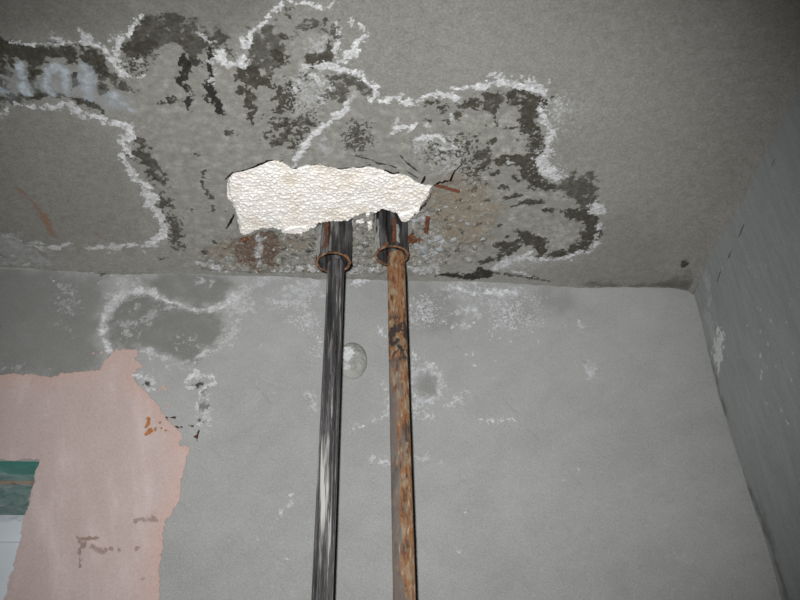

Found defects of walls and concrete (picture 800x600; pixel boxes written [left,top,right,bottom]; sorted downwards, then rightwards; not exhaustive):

damp [0,0,607,343]
crack [225,155,462,217]
spalling [199,229,326,274]
spalling [344,215,387,275]
spalling [405,173,505,276]
damp [98,278,255,370]
damp [254,234,325,366]
peeling [132,371,167,392]
damp [409,350,471,421]